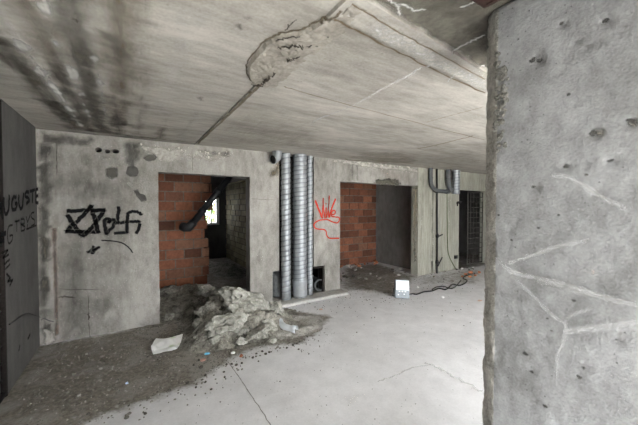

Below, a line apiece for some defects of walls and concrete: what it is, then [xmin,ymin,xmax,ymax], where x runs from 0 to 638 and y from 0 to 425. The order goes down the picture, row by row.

damp [0,0,130,145]
spalling [245,5,367,88]
crack [284,4,485,149]